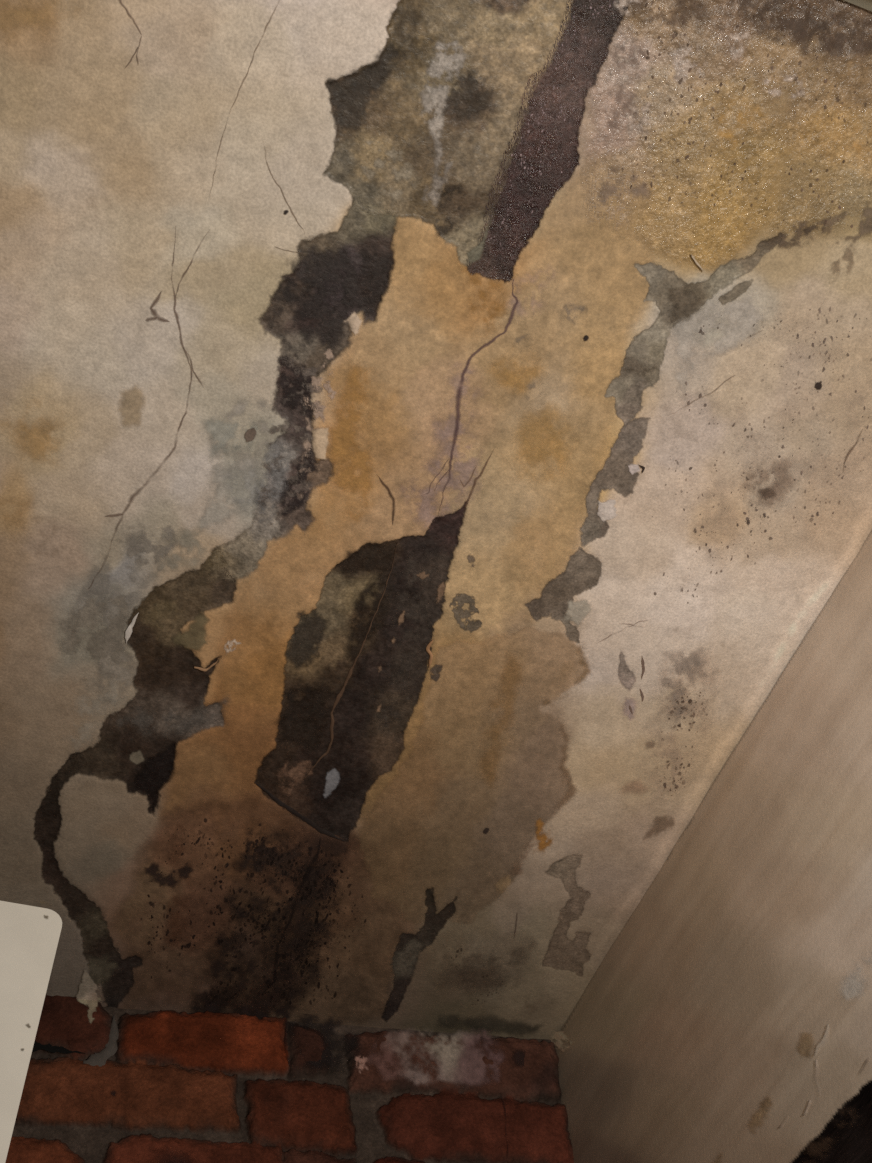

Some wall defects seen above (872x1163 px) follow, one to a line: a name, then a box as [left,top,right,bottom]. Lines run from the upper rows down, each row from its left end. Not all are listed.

crack [147,232,200,385]
crack [427,280,518,511]
flaking render [34,0,631,1023]
crack [377,475,394,525]
leakage [355,1016,538,1084]